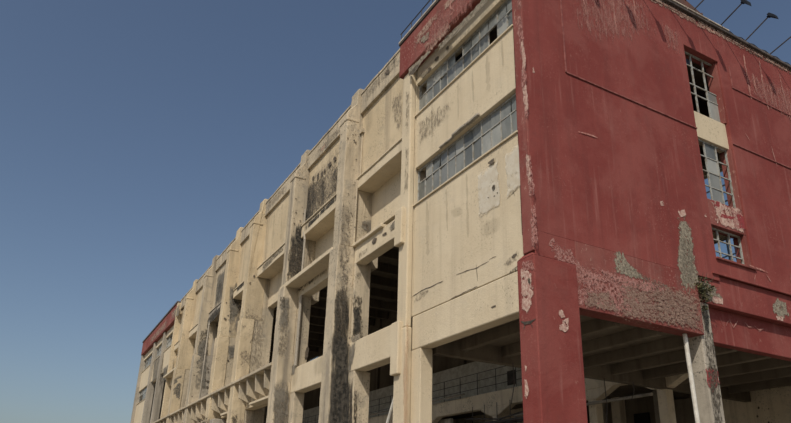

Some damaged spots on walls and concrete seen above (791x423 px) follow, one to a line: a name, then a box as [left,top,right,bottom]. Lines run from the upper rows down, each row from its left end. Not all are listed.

peeling [409,0,488,78]
peeling [517,0,535,116]
peeling [526,154,535,195]
leakage [263,163,338,278]
peeling [530,205,538,245]
peeling [704,200,746,233]
leakage [328,213,363,423]
crack [412,256,496,299]
peeling [506,254,534,313]
peeling [549,209,723,332]
spalling [772,299,789,321]
leakage [273,385,289,423]